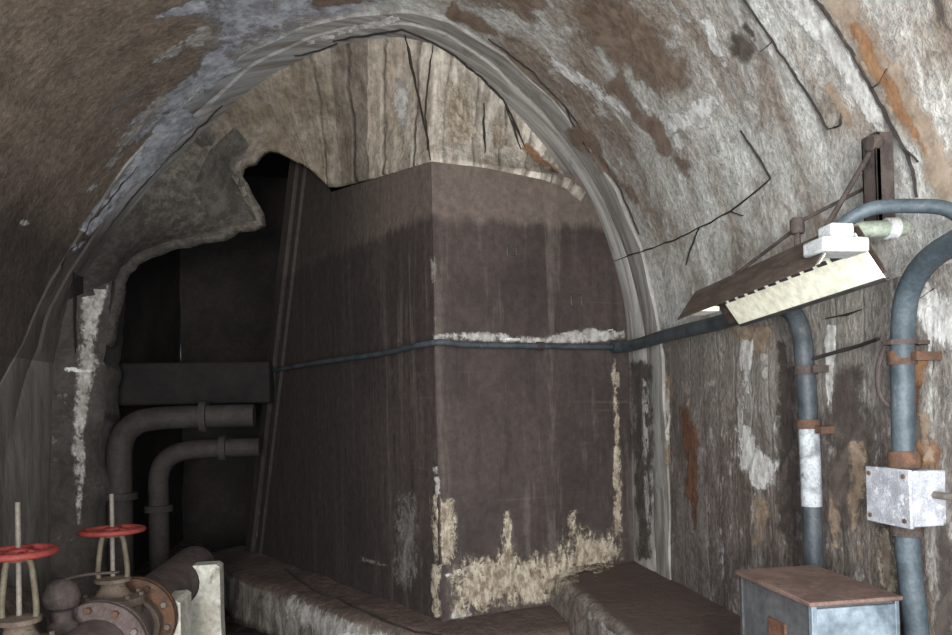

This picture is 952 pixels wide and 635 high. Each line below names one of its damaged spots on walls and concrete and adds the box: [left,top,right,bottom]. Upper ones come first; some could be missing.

crack [294,29,526,160]
crack [488,38,771,265]
crack [743,0,843,130]
corrosion [824,0,952,202]
spalling [65,286,108,524]
corrosion [680,387,699,530]